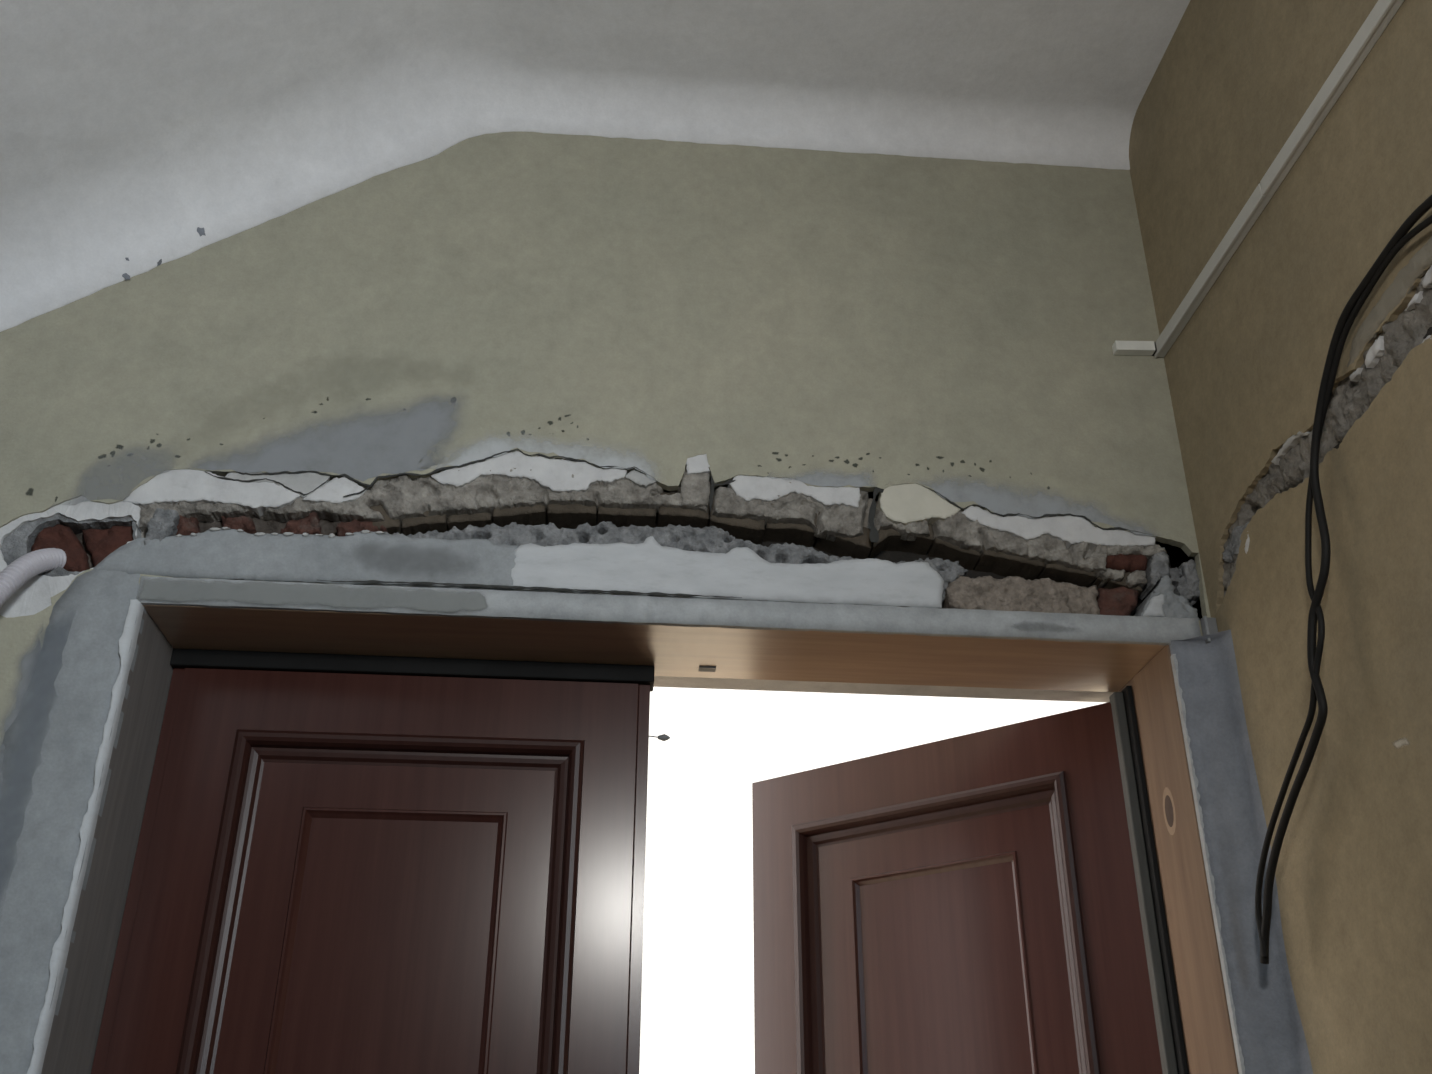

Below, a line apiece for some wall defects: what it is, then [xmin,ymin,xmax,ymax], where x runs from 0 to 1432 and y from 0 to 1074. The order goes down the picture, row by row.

peeling [1404,266,1432,311]
peeling [1349,336,1385,382]
peeling [1271,431,1310,465]
crack [206,448,655,497]
crack [709,468,735,512]
spalling [0,415,1200,620]